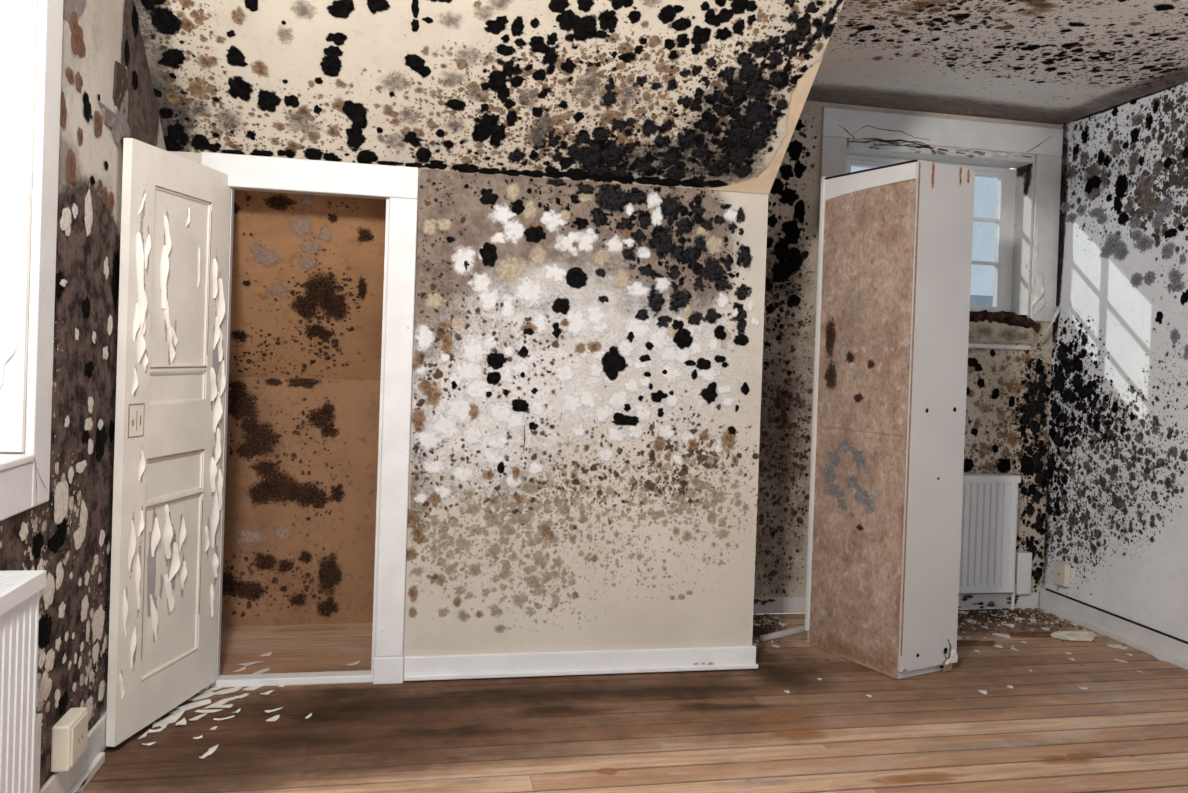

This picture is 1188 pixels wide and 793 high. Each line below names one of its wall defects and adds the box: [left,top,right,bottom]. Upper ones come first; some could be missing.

damp [70,12,86,57]
peeling [212,326,220,383]
damp [121,0,1188,632]
damp [0,67,120,789]
peeling [147,522,174,617]